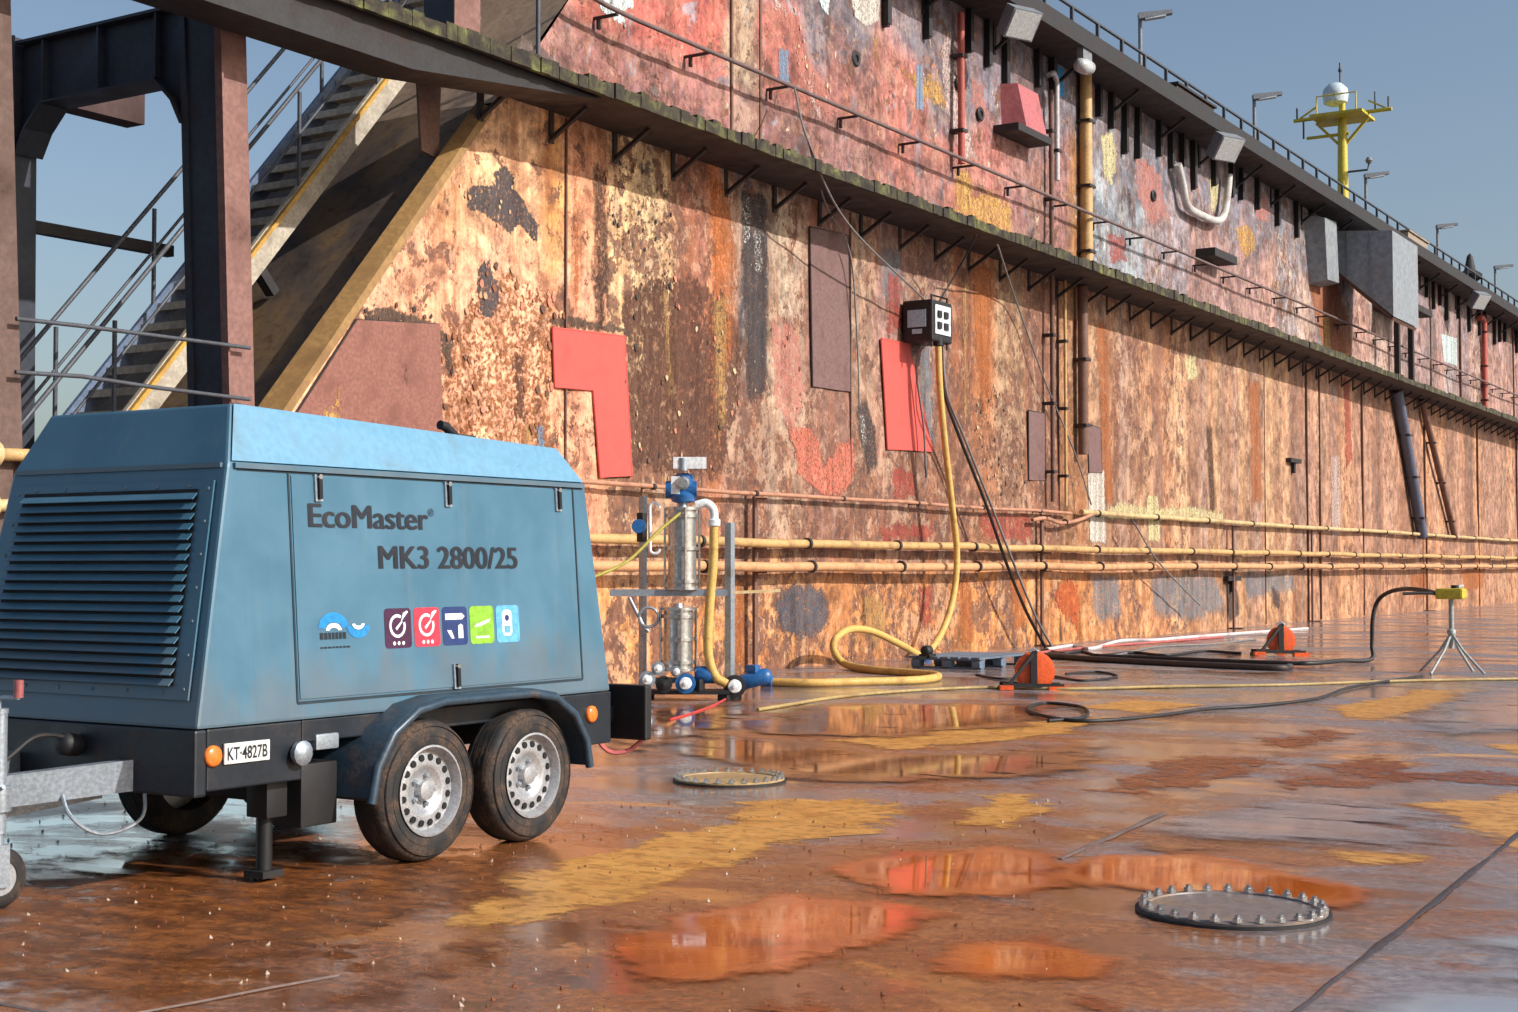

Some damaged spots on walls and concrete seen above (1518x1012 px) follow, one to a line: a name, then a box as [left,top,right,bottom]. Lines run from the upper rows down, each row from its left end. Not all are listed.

rust [940,31,978,160]
peeling [460,166,539,242]
rust [571,191,579,301]
peeling [364,259,570,448]
rust [622,179,742,481]
rust [1308,276,1351,356]
rust [1096,321,1117,502]
rust [1207,426,1215,513]
rust [1249,382,1262,505]
rust [1342,378,1353,466]
rust [1009,578,1027,629]
rust [1054,578,1082,639]